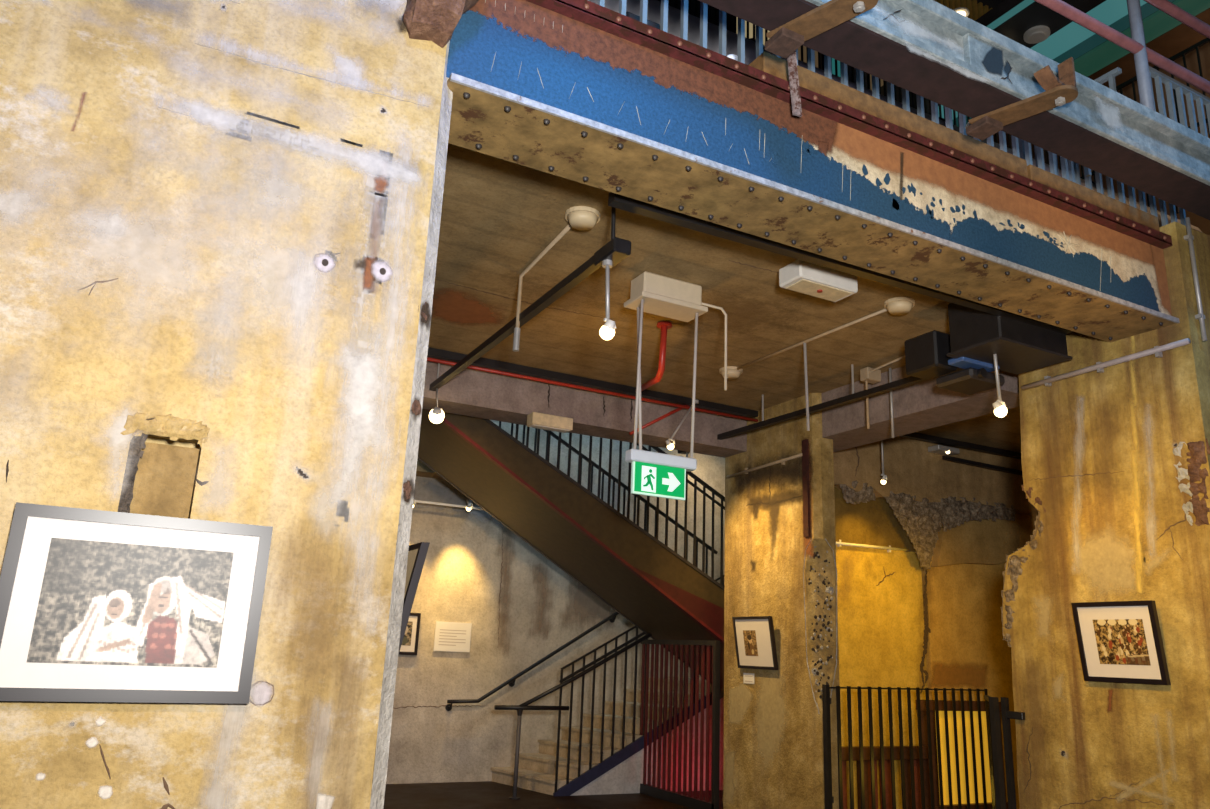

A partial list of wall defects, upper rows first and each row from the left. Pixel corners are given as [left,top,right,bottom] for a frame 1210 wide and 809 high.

peeling [446,8,1161,312]
corrosion [464,0,1172,315]
leakage [754,502,779,545]
leakage [736,455,810,491]
spalling [803,539,837,714]
crack [920,570,931,693]
spalling [840,480,1046,647]
spalling [1173,438,1210,526]